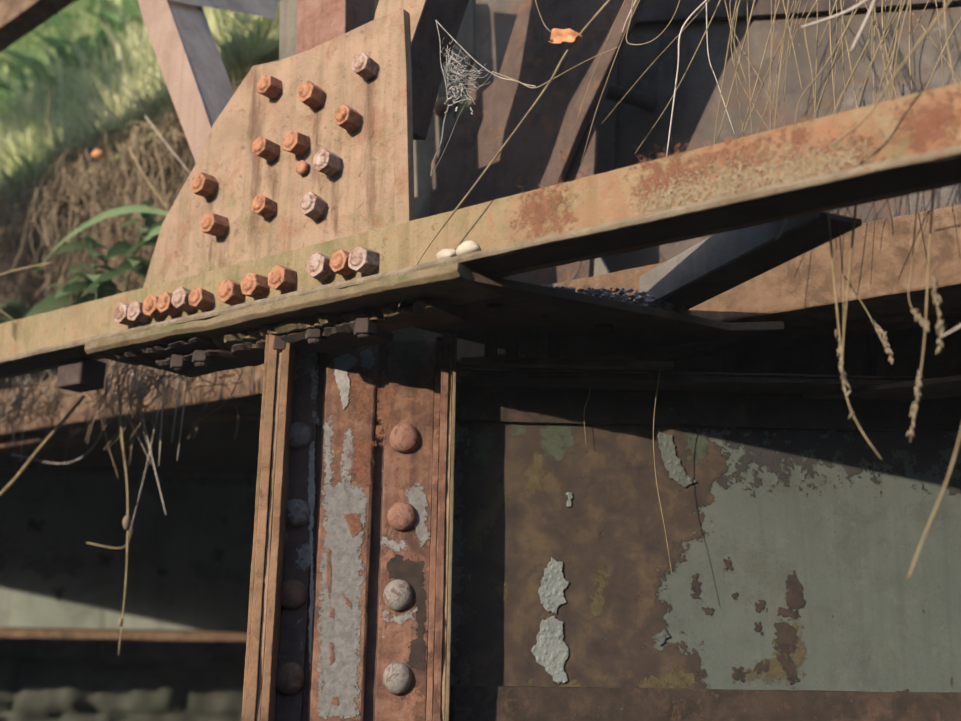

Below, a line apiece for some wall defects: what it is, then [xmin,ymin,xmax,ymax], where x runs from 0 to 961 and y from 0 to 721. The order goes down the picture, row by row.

corrosion [894,88,961,153]
corrosion [632,116,885,206]
corrosion [511,177,577,238]
peeling [333,348,375,409]
peeling [284,353,368,719]
peeling [381,482,430,551]
peeling [450,403,961,690]
peeling [383,607,417,625]
corrosion [386,554,428,670]
corrosion [690,573,714,616]
corrosion [731,570,806,685]